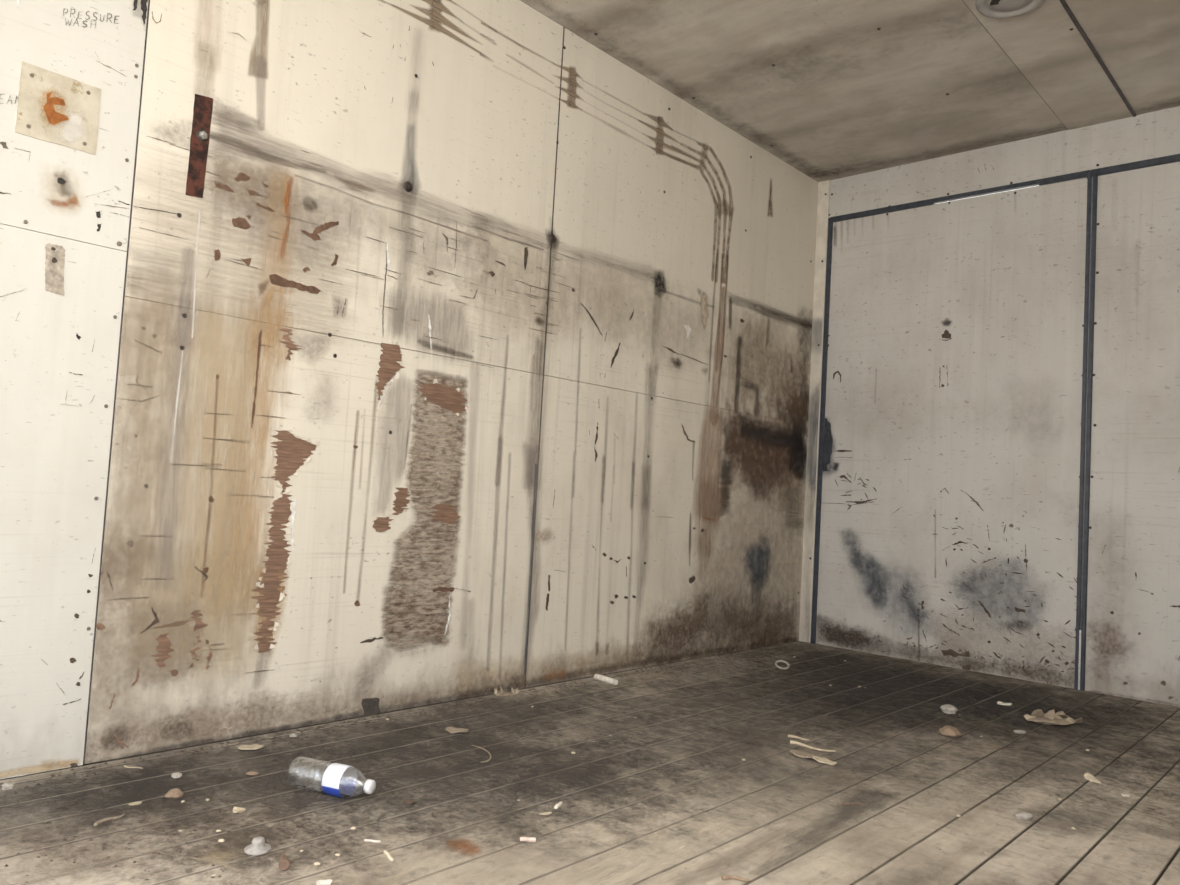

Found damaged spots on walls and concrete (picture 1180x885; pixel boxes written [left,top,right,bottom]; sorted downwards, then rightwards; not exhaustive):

rust [43,91,69,125]
leakage [640,115,812,507]
peeling [375,341,405,405]
leakage [823,425,832,471]
peeling [360,373,471,648]